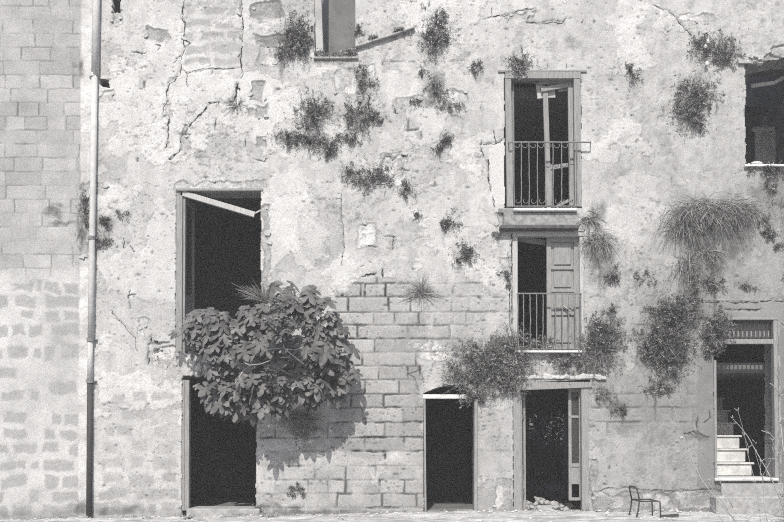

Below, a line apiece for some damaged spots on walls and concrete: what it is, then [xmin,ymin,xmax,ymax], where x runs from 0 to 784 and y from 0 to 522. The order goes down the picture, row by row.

spalling [250,0,282,18]
crack [490,8,583,25]
spalling [144,27,170,42]
crack [163,0,244,160]
peeling [408,342,449,361]
spalling [492,478,510,510]